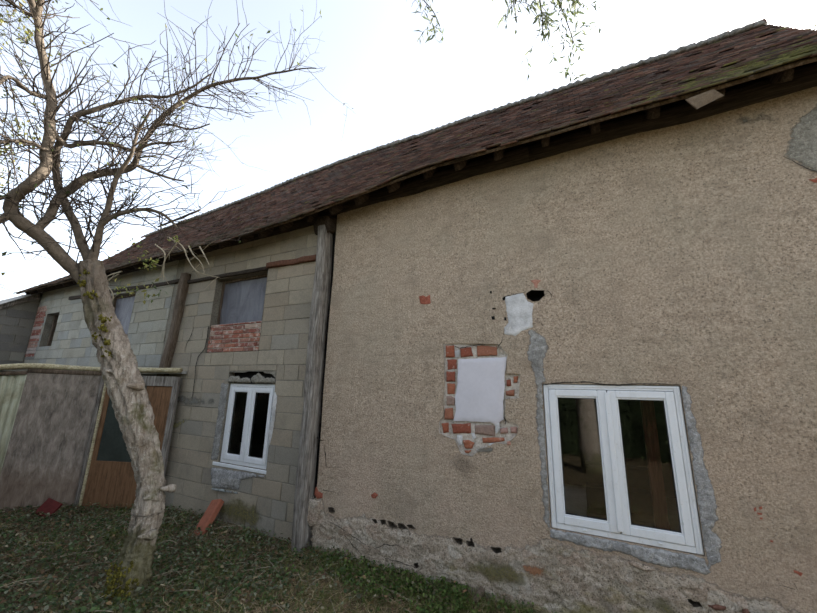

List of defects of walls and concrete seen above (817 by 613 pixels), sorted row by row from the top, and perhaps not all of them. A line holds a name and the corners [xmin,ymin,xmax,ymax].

spalling [439,279,552,456]
spalling [307,487,798,613]